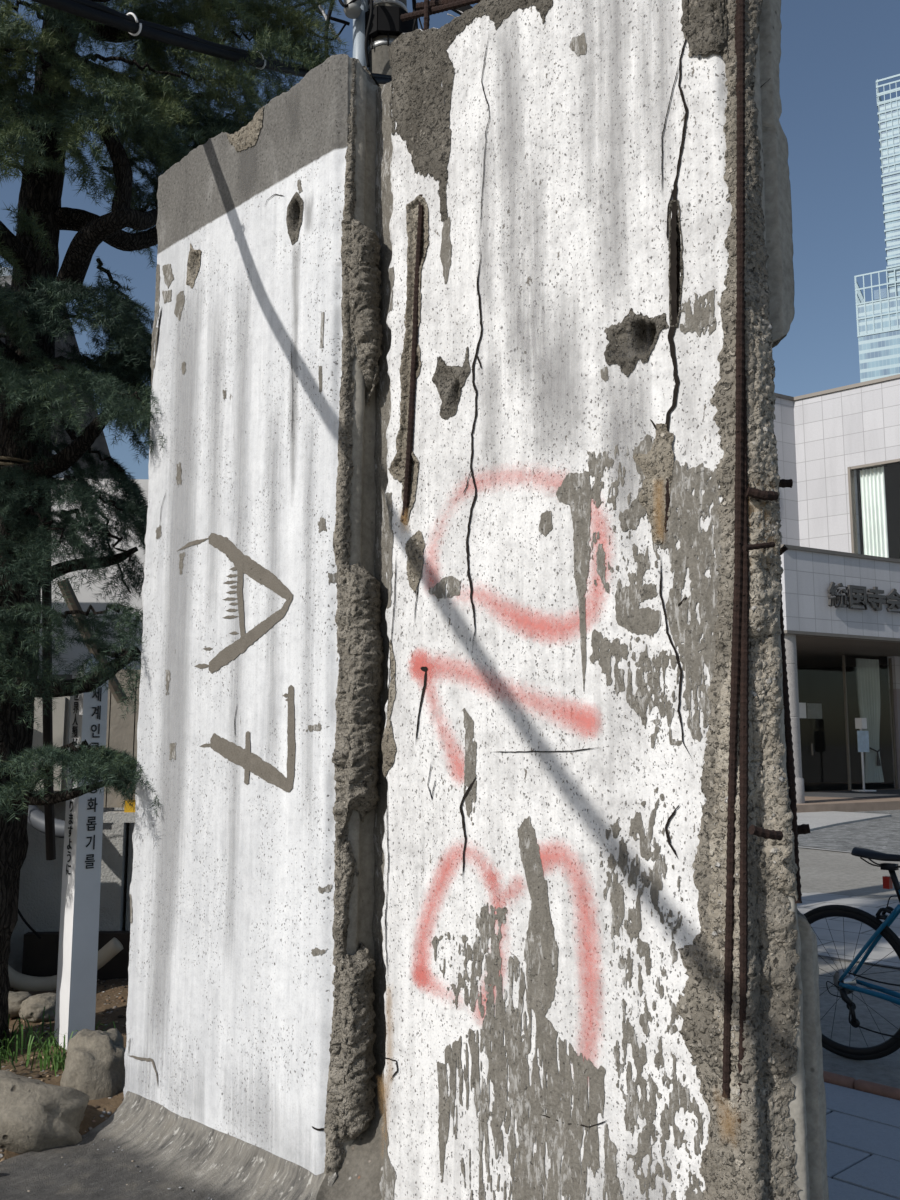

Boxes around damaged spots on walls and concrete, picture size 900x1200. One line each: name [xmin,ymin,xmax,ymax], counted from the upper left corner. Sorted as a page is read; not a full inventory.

spalling [227,106,264,152]
spalling [286,179,303,245]
spalling [318,245,356,585]
spalling [343,58,357,220]
peeling [385,0,553,608]
crack [463,27,490,650]
crack [650,32,688,432]
spalling [431,0,810,1200]
spalling [381,640,396,777]
spalling [311,823,349,1017]
spalling [324,1053,346,1177]
peeling [379,1073,396,1200]